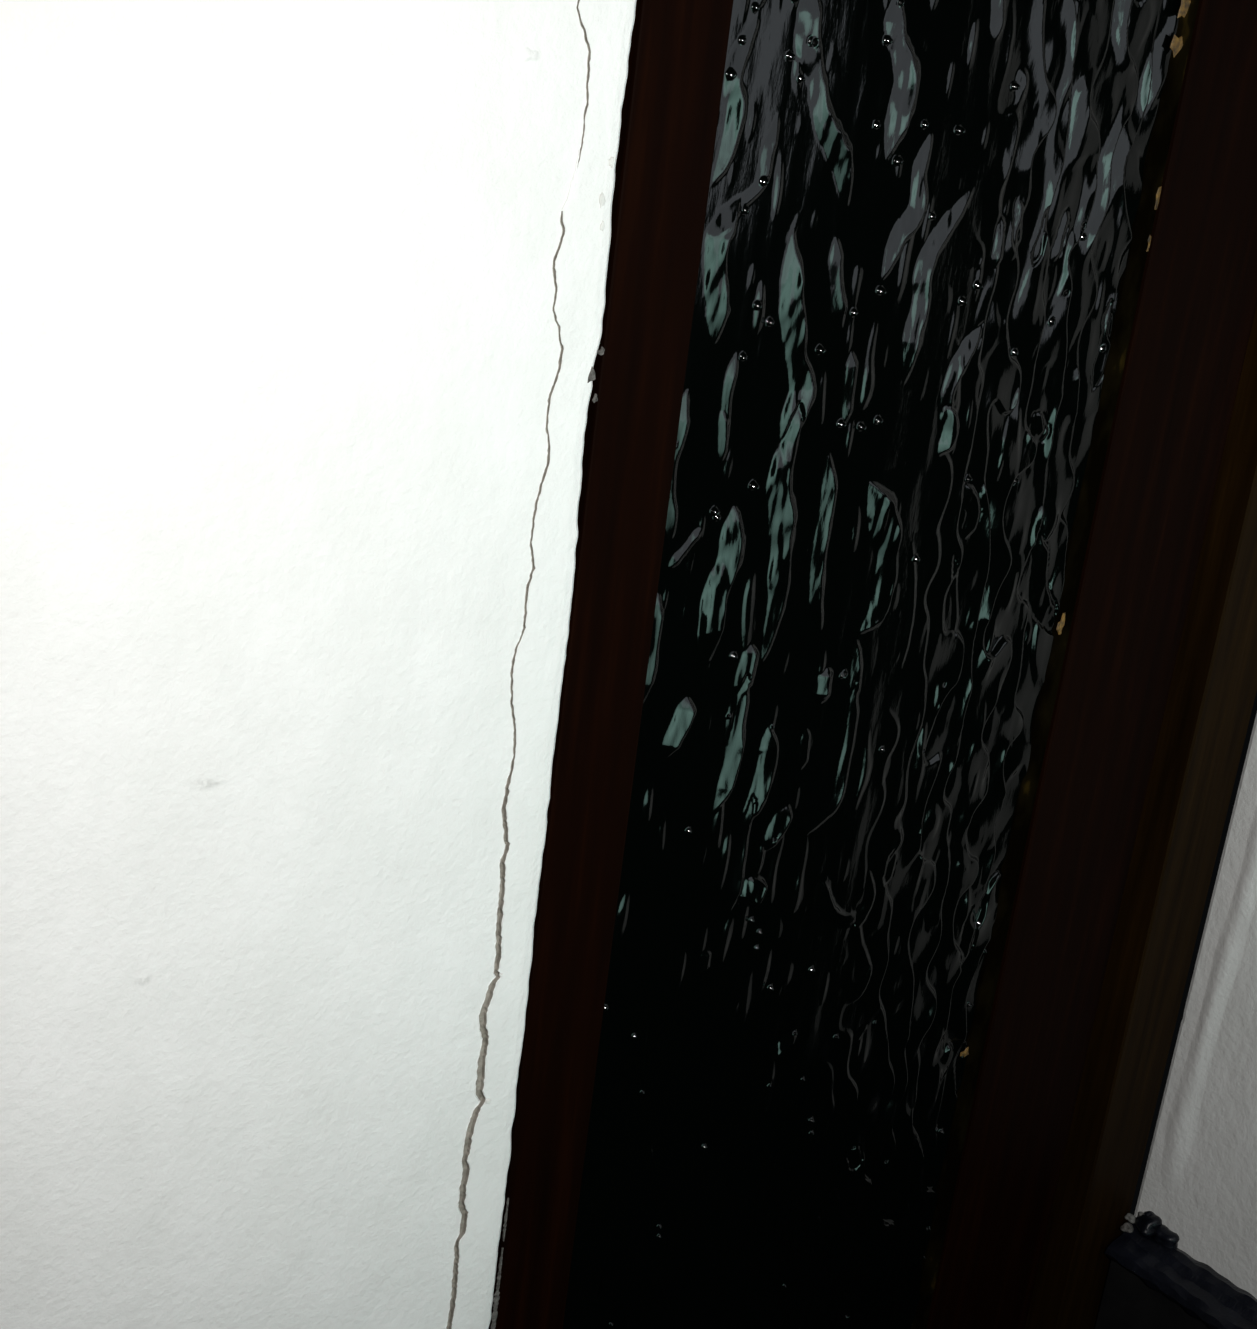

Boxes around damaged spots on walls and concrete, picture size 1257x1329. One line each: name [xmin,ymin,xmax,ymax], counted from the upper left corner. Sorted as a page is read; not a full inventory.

crack [445,0,592,1329]